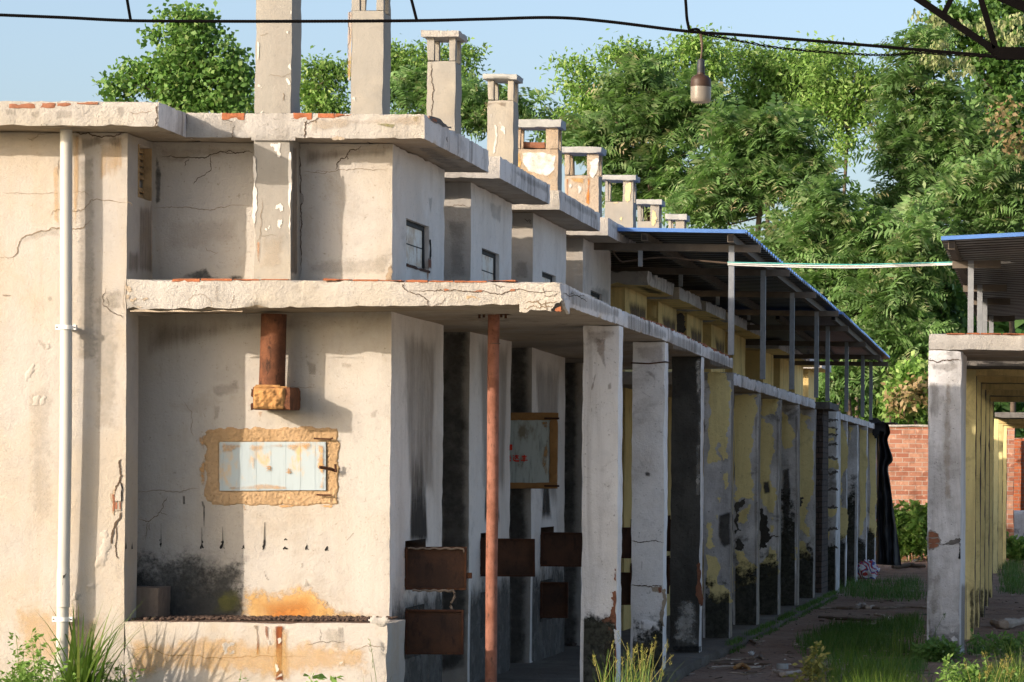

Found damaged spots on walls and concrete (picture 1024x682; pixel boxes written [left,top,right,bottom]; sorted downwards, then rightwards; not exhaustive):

crack [1,161,132,258]
peeling [252,143,304,235]
crack [269,73,382,276]
peeling [523,152,555,175]
crack [401,283,586,308]
crack [111,459,196,559]
water stain [442,332,466,547]
peeling [695,371,814,606]
peeling [828,421,877,540]
corrosion [245,587,333,680]
water stain [442,590,465,616]
water stain [633,469,813,670]